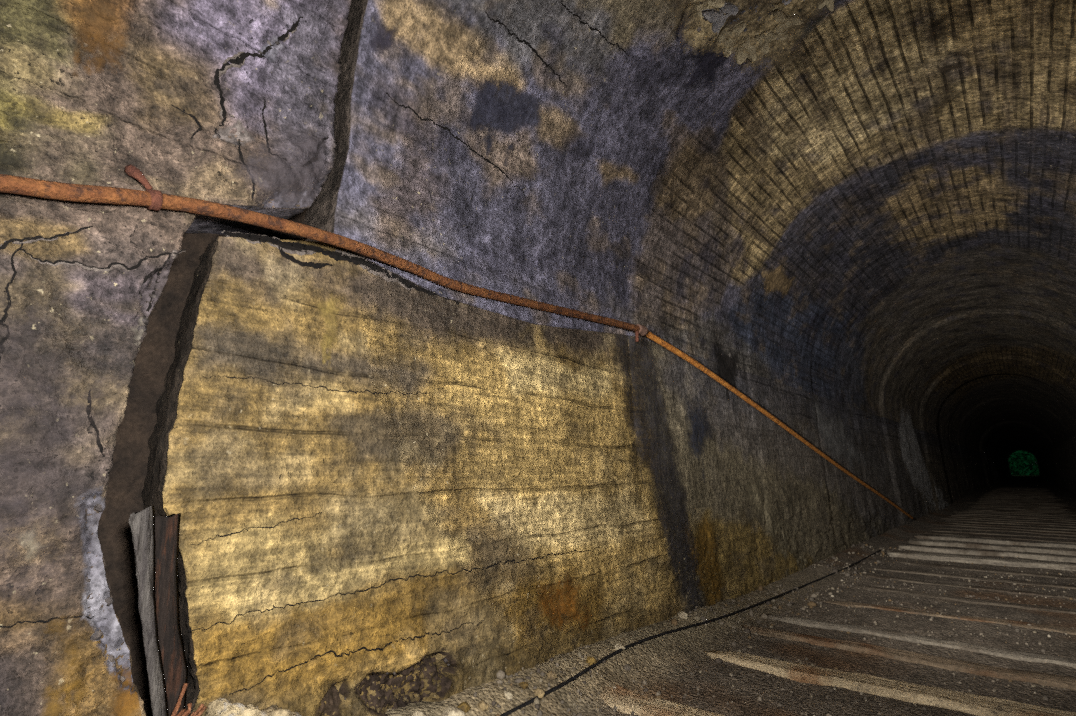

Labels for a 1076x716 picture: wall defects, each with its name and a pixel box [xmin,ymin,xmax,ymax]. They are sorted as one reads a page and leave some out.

crack [171,17,329,200]
peeling [673,0,834,71]
crack [0,209,485,716]
leakage [616,334,701,611]
crack [189,547,598,632]
spalling [317,649,457,716]